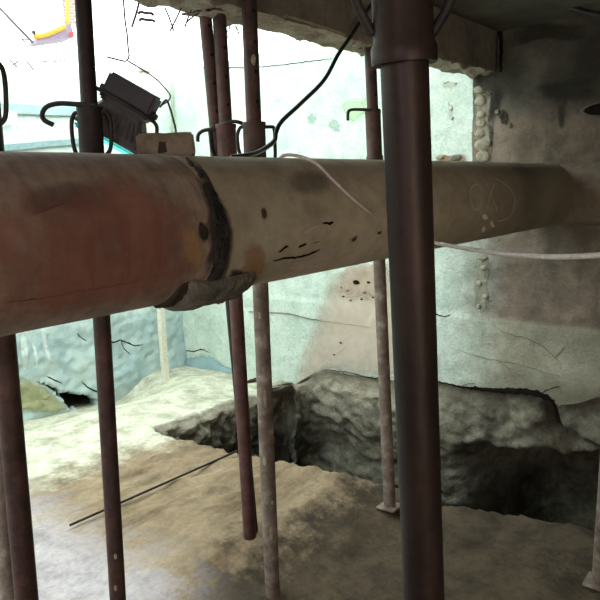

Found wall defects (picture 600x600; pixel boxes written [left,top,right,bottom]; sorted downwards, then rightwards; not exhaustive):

crack [274,241,320,261]
crack [269,312,368,328]